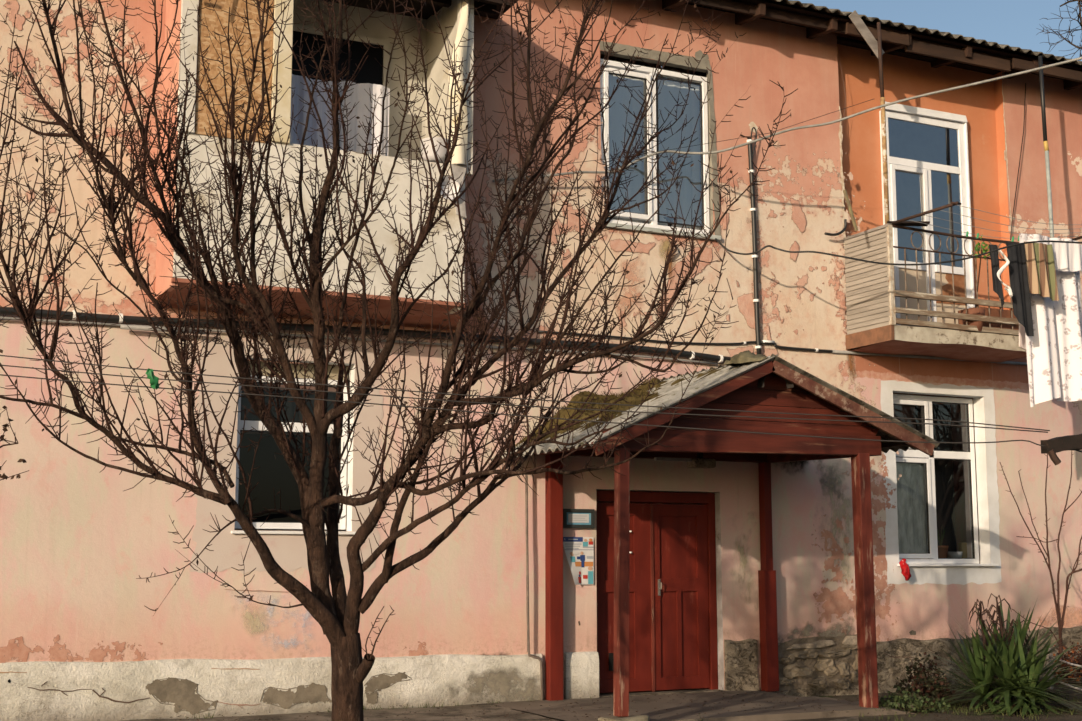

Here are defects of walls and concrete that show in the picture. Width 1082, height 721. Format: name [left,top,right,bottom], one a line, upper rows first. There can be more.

peeling [0,0,162,330]
peeling [477,106,878,407]
peeling [813,515,856,634]
peeling [0,635,149,663]
crack [0,671,150,703]
spalling [146,677,218,715]
spalling [260,683,332,709]
spalling [364,672,412,705]